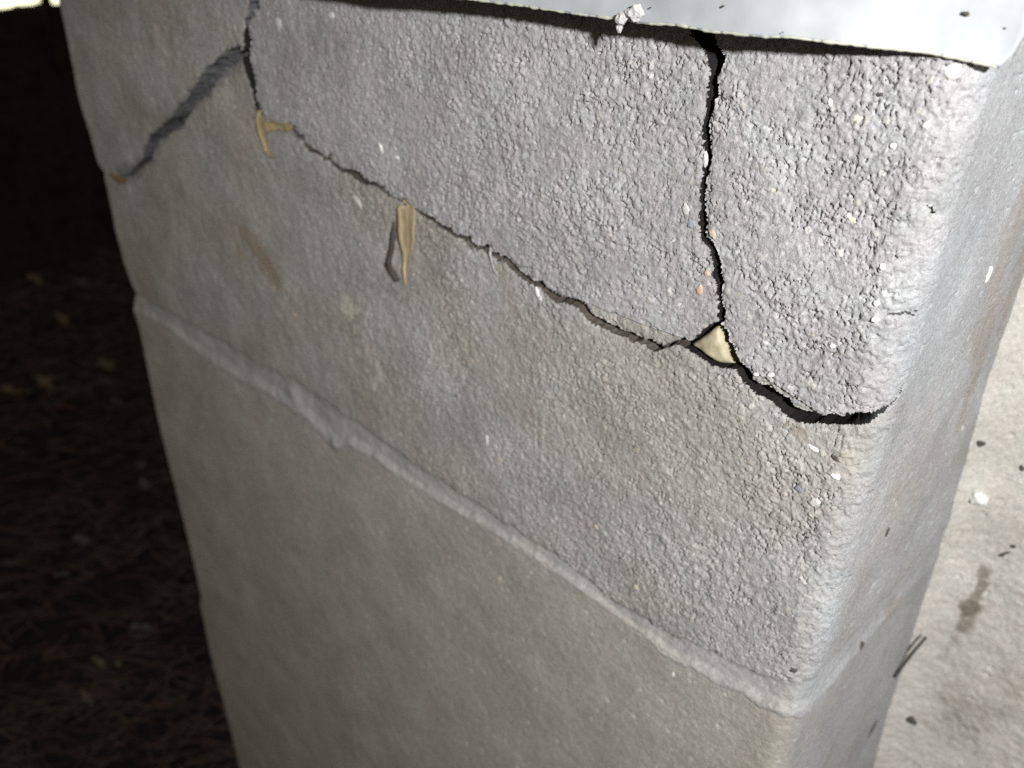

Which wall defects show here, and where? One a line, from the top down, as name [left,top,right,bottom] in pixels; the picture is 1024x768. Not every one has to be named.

crack [242,0,263,114]
crack [290,29,902,425]